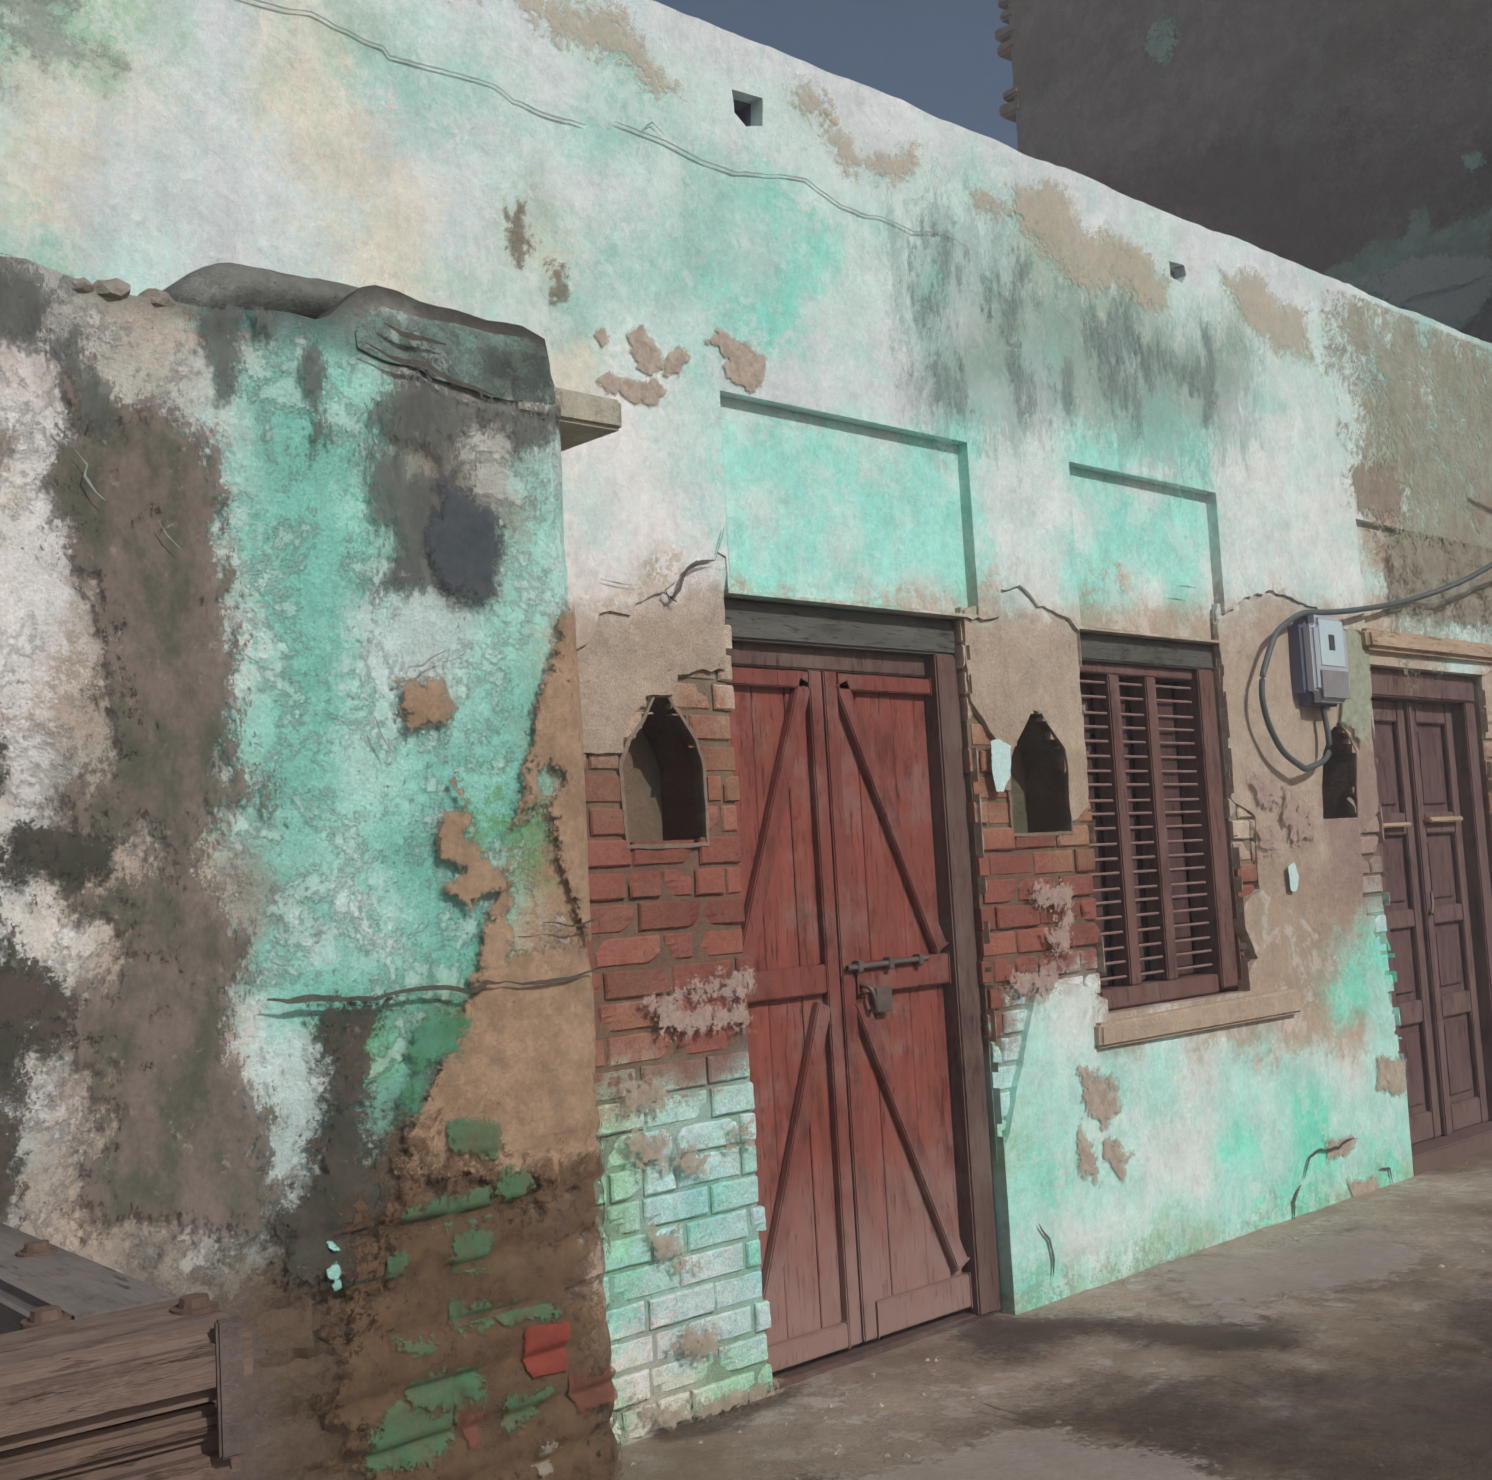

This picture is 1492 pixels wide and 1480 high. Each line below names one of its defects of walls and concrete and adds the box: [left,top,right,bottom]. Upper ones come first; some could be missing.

crack [254,0,980,254]
peeling [595,324,691,408]
flaking render [1219,265,1492,643]
water stain [0,253,629,1480]
crack [267,969,597,1004]
crack [518,917,601,938]
flaking render [363,553,784,1478]
flaking render [954,586,1101,1161]
flaking render [1209,591,1408,1099]
crack [1293,1138,1355,1219]
water stain [648,1383,807,1439]
water stain [950,1273,1492,1480]